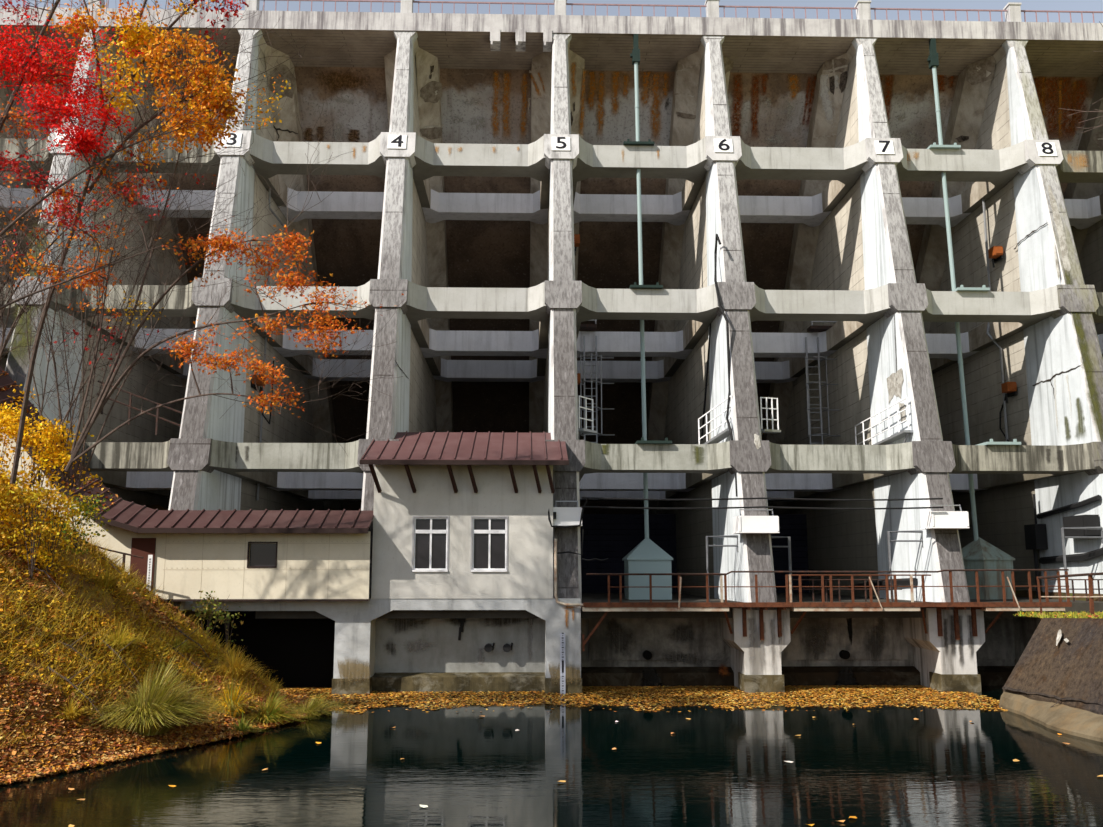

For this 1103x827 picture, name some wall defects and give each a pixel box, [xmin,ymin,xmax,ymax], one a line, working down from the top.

spalling [420,65,442,103]
spalling [420,124,444,140]
rust [492,72,545,134]
rust [571,63,629,132]
rust [641,72,669,135]
rust [732,74,768,136]
rust [789,75,817,125]
rust [1034,76,1087,139]
crack [1032,365,1081,394]